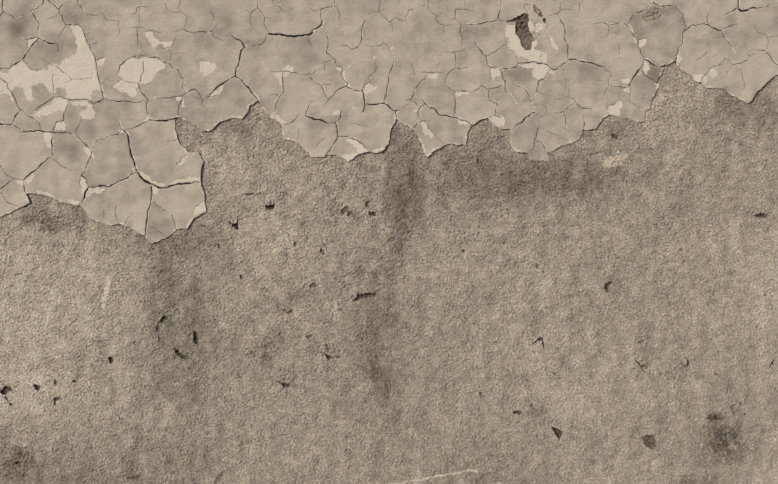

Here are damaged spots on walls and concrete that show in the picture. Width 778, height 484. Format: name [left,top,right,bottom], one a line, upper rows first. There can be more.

peeling [0,25,472,243]
crack [0,0,778,234]
peeling [505,4,558,81]
peeling [484,102,588,161]
peeling [600,4,687,122]
peeling [693,51,778,104]